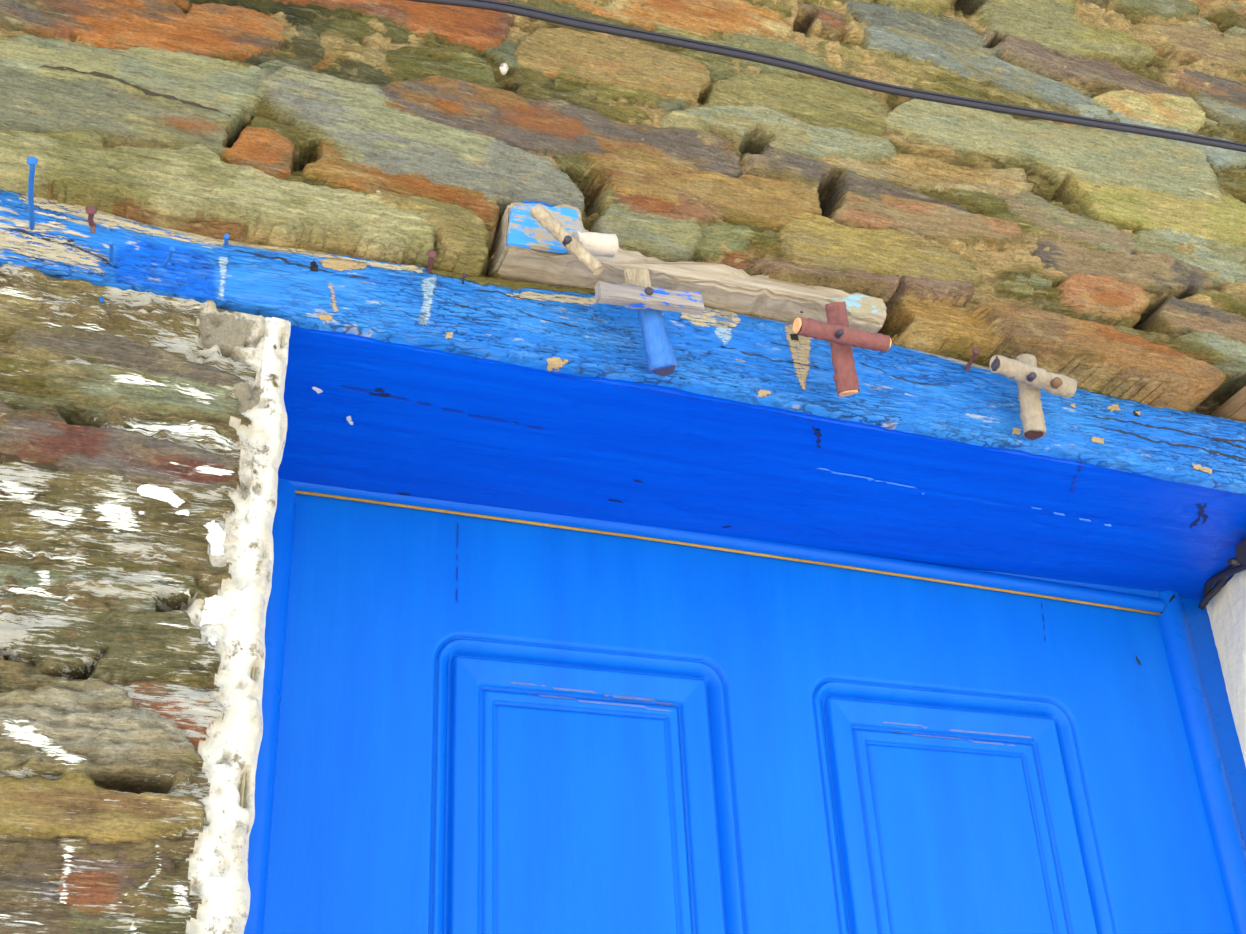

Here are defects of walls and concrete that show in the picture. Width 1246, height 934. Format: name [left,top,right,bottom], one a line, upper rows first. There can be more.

peeling [19,195,225,248]
peeling [0,228,109,275]
peeling [297,251,424,273]
peeling [505,291,596,306]
spalling [196,312,255,358]
peeling [681,310,740,329]
spalling [547,357,569,373]
peeling [111,368,219,405]
peeling [121,419,236,452]
peeling [196,465,257,500]
peeling [0,476,190,544]
peeling [0,547,92,601]